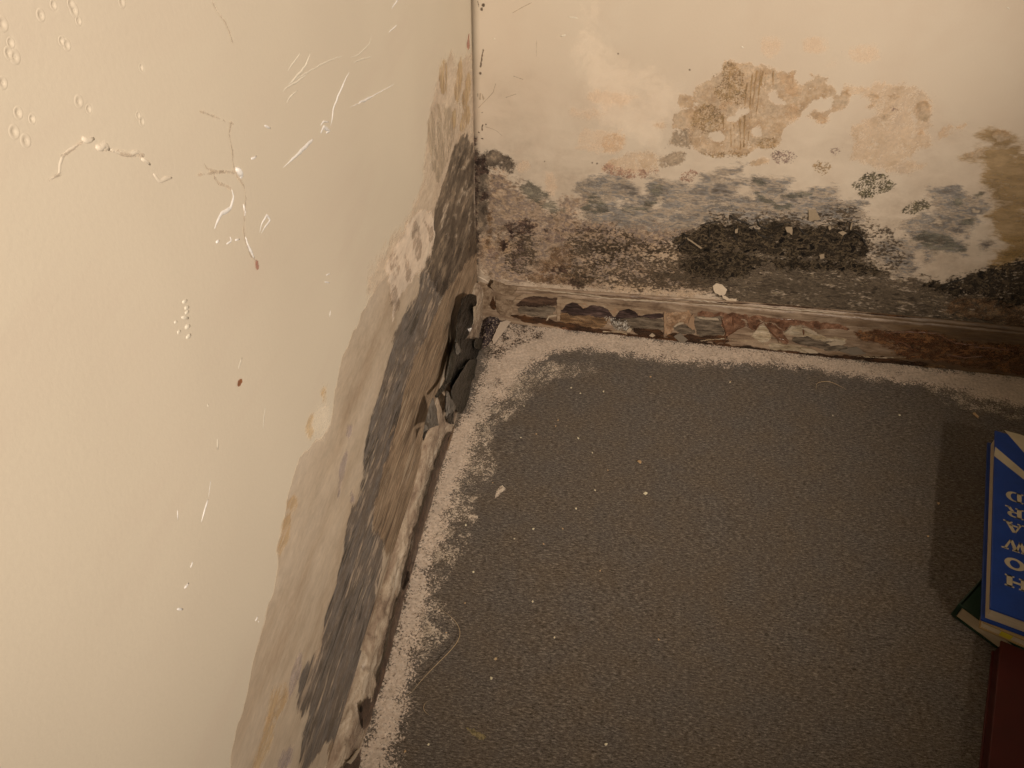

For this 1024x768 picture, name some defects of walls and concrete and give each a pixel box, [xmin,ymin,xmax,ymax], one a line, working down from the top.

crack [49,136,172,183]
crack [214,167,259,270]
peeling [478,269,729,345]
peeling [713,283,737,301]
peeling [752,325,866,355]
water stain [231,49,1024,768]